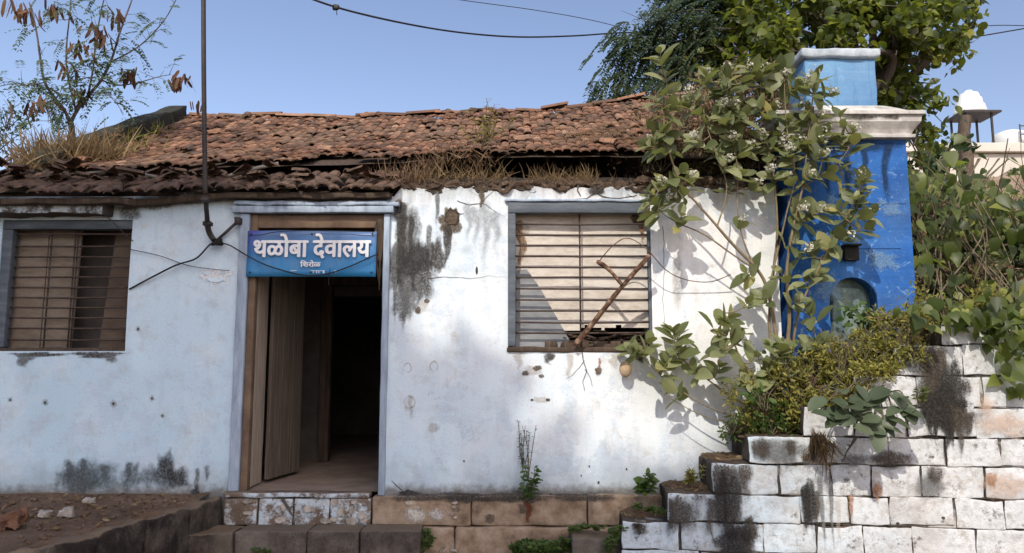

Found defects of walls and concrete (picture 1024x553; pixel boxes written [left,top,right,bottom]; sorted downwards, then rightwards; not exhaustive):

damp [381,204,444,321]
spalling [425,181,464,265]
damp [11,352,122,365]
damp [905,345,977,454]
damp [63,453,208,494]
damp [668,438,807,553]
damp [800,473,834,538]